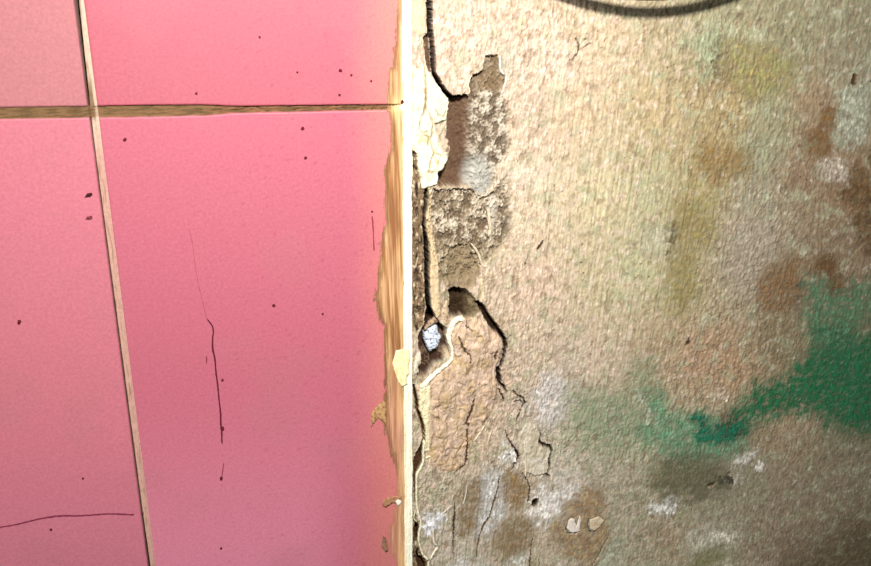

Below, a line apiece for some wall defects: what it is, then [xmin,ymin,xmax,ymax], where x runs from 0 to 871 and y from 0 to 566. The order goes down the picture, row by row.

crack [423,0,469,98]
crack [411,150,436,334]
spalling [392,53,518,387]
crack [0,512,144,528]
crack [189,231,224,477]
crack [412,299,532,566]
damp [571,275,871,472]